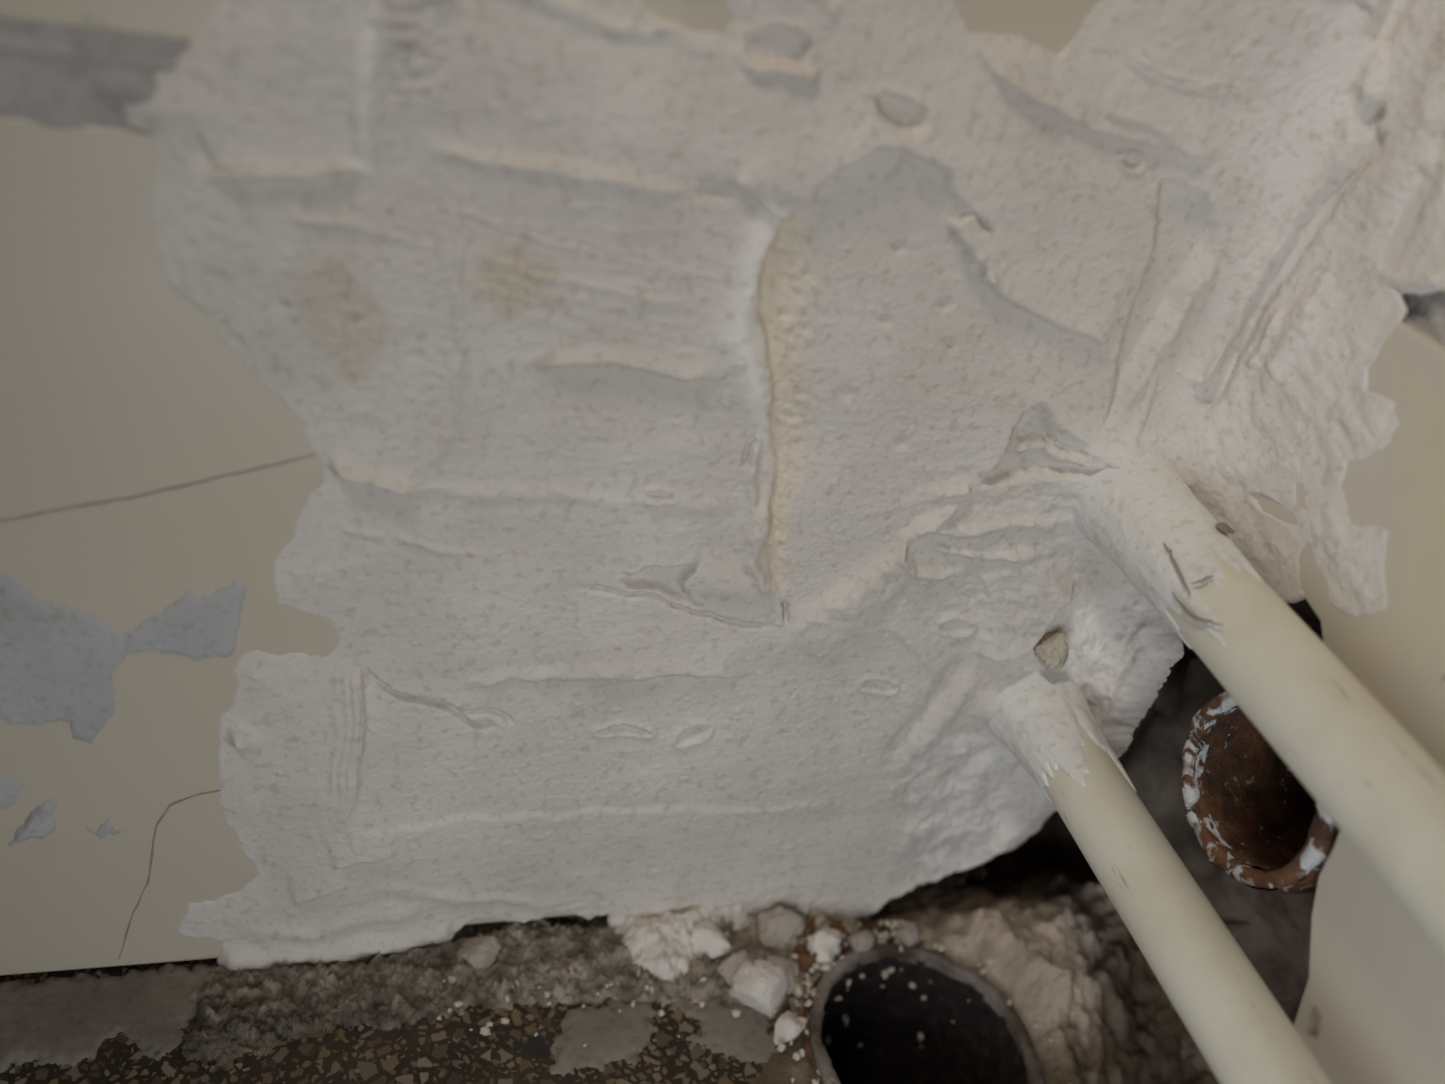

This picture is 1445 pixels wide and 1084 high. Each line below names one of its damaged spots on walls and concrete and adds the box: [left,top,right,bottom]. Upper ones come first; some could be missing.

crack [0,454,316,521]
peeling [123,578,246,661]
crack [358,667,517,729]
crack [118,790,221,959]